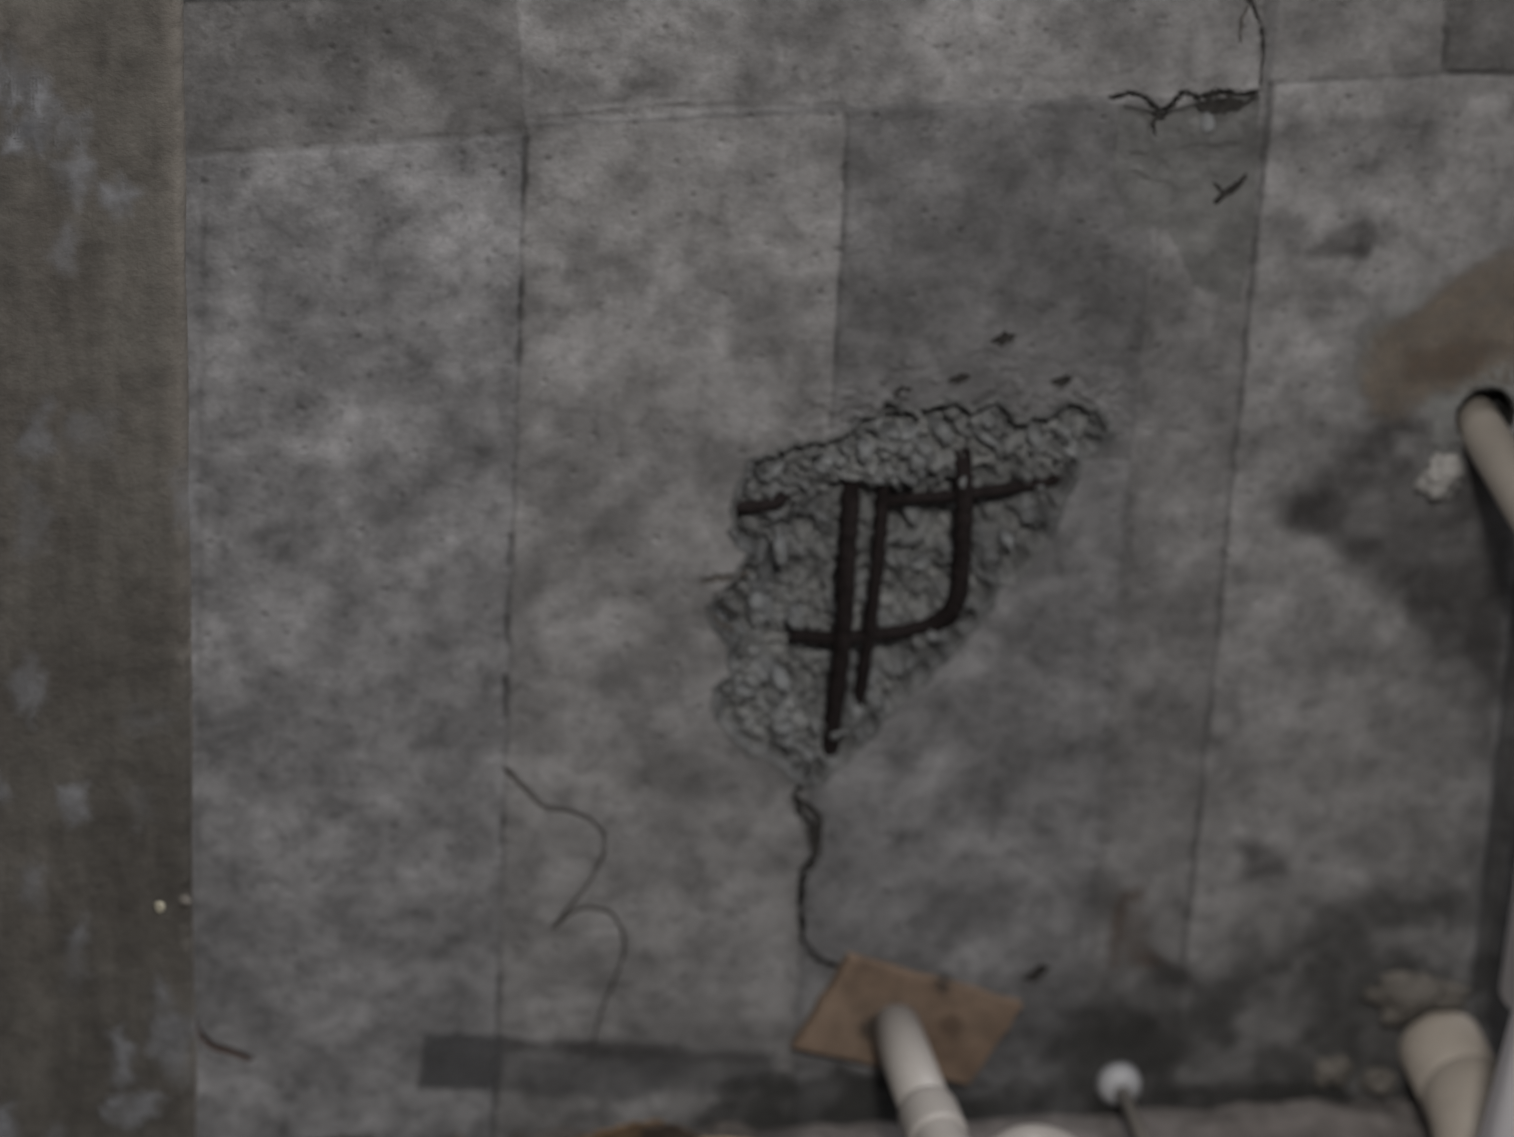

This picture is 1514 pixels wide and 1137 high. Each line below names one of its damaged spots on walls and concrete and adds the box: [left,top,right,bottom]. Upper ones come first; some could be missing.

crack [1111,0,1265,135]
crack [1213,173,1247,205]
spalling [990,331,1016,346]
spalling [705,373,1117,789]
crack [504,768,626,1065]
crack [789,768,839,968]